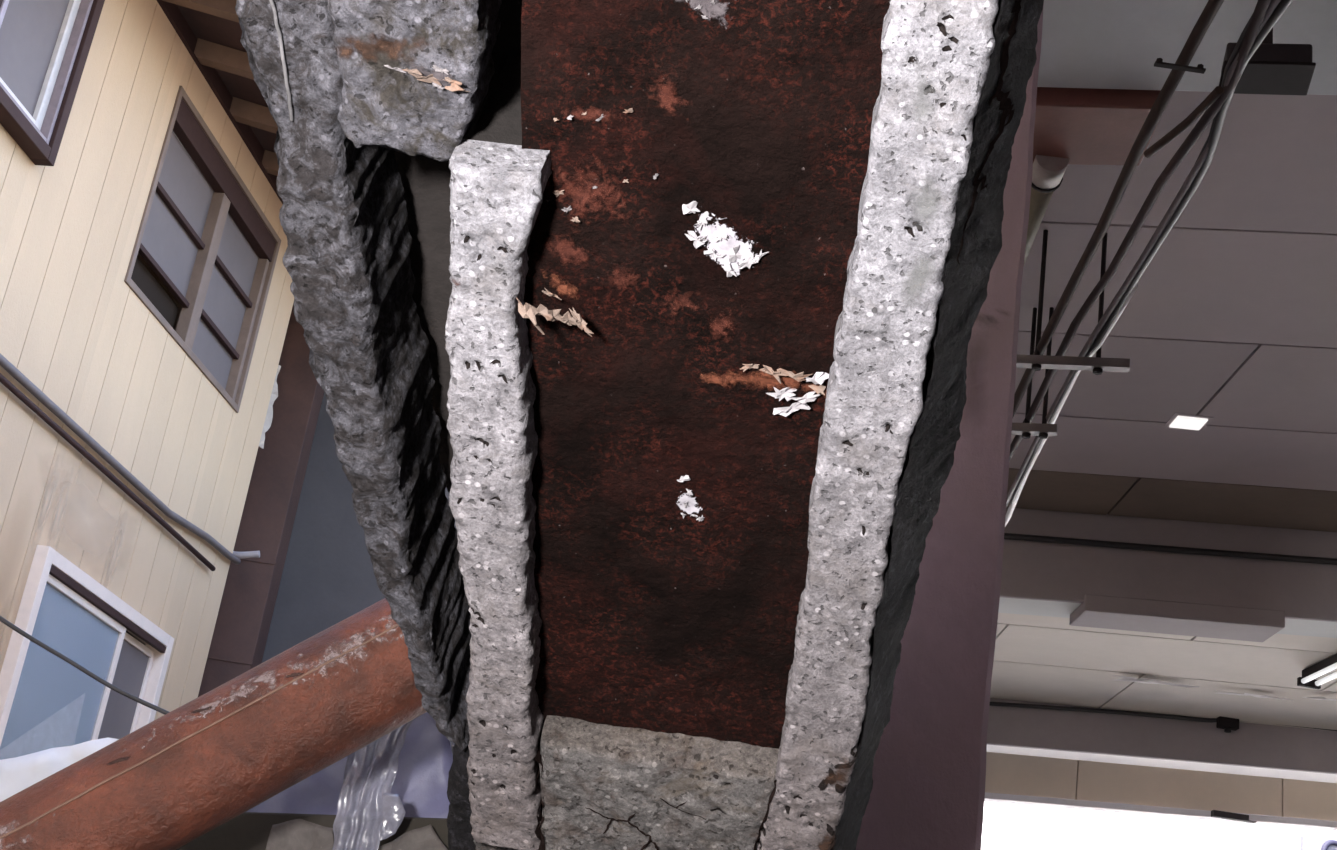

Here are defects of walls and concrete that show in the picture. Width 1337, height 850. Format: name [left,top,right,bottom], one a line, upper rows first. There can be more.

peeling [686,0,729,29]
spalling [936,14,958,51]
rust [553,108,634,121]
rust [658,79,685,110]
rust [552,170,629,223]
peeling [682,201,768,277]
peeling [516,275,594,337]
rust [713,318,731,341]
rust [702,364,829,417]
peeling [677,475,705,521]
crack [534,724,545,850]
crack [585,798,706,850]